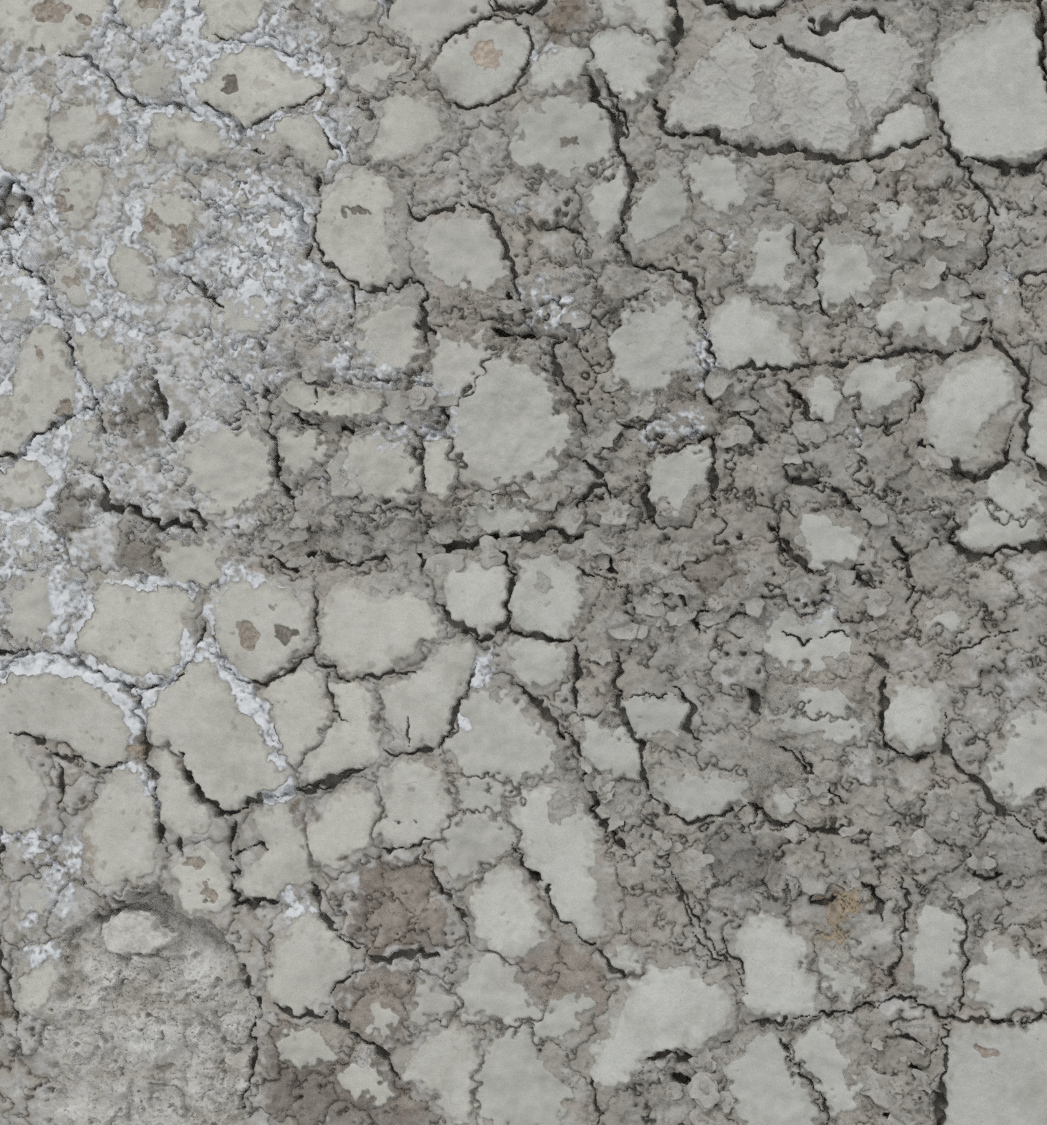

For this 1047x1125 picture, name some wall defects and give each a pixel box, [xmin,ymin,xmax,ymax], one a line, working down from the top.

efflorescence [0,165,155,395]
damp [68,0,362,324]
damp [210,327,285,401]
spalling [181,103,1047,687]
crack [705,0,885,73]
crack [582,75,1047,483]
damp [0,349,320,851]
crack [10,659,365,909]
crack [418,460,626,849]
spalling [0,535,1047,1125]
crack [612,652,844,835]
crack [751,877,1047,1125]